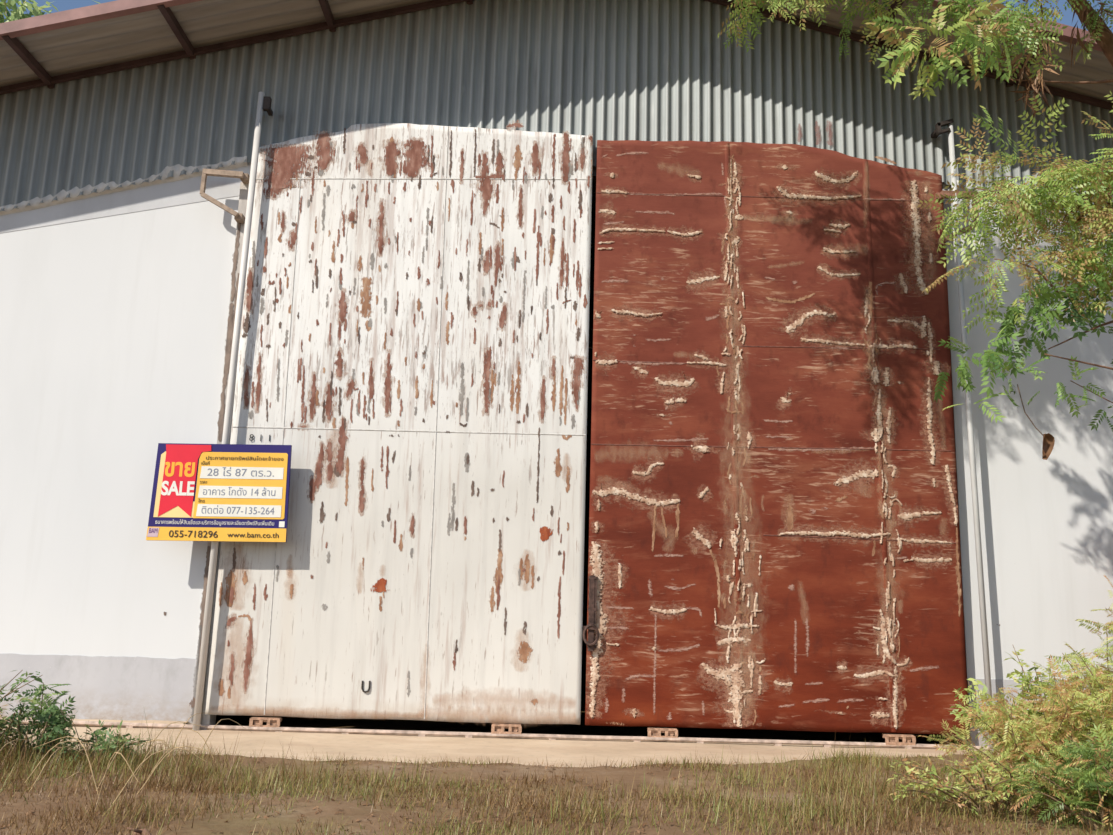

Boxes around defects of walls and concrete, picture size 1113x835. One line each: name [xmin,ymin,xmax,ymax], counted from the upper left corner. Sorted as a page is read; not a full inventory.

corrosion [766,293,815,303]
corrosion [242,120,593,638]
corrosion [218,547,294,699]
corrosion [517,621,533,663]